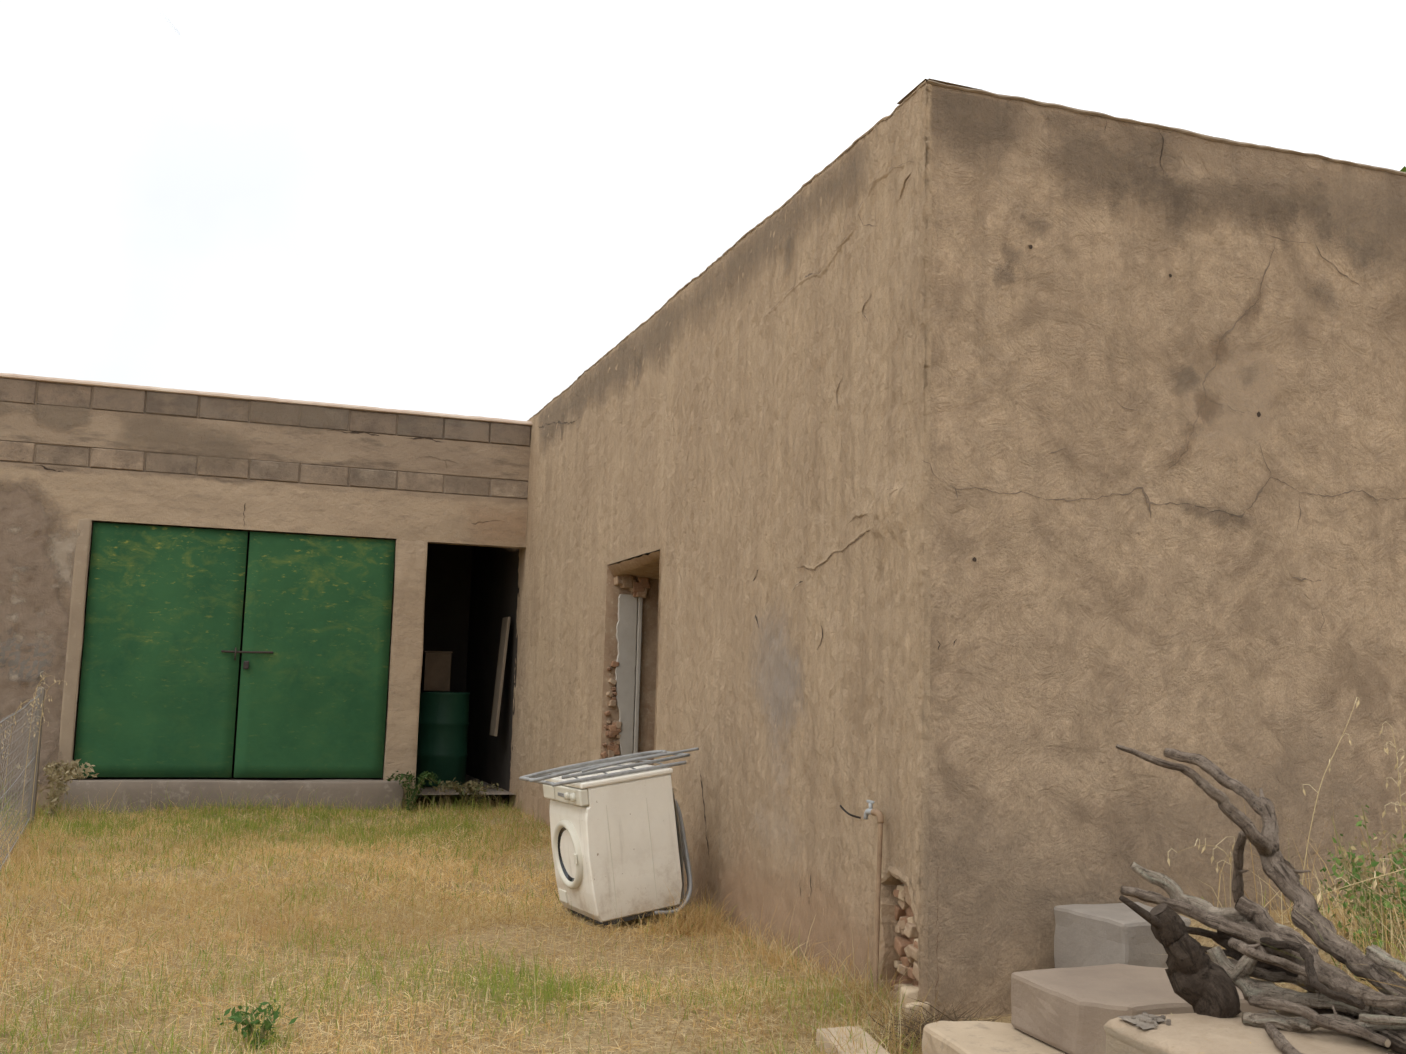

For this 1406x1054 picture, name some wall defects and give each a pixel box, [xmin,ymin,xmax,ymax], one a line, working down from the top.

crack [766,161,912,317]
crack [1169,234,1360,468]
crack [797,487,893,571]
crack [924,443,1406,528]
spalling [600,661,622,759]
spalling [878,865,940,1022]